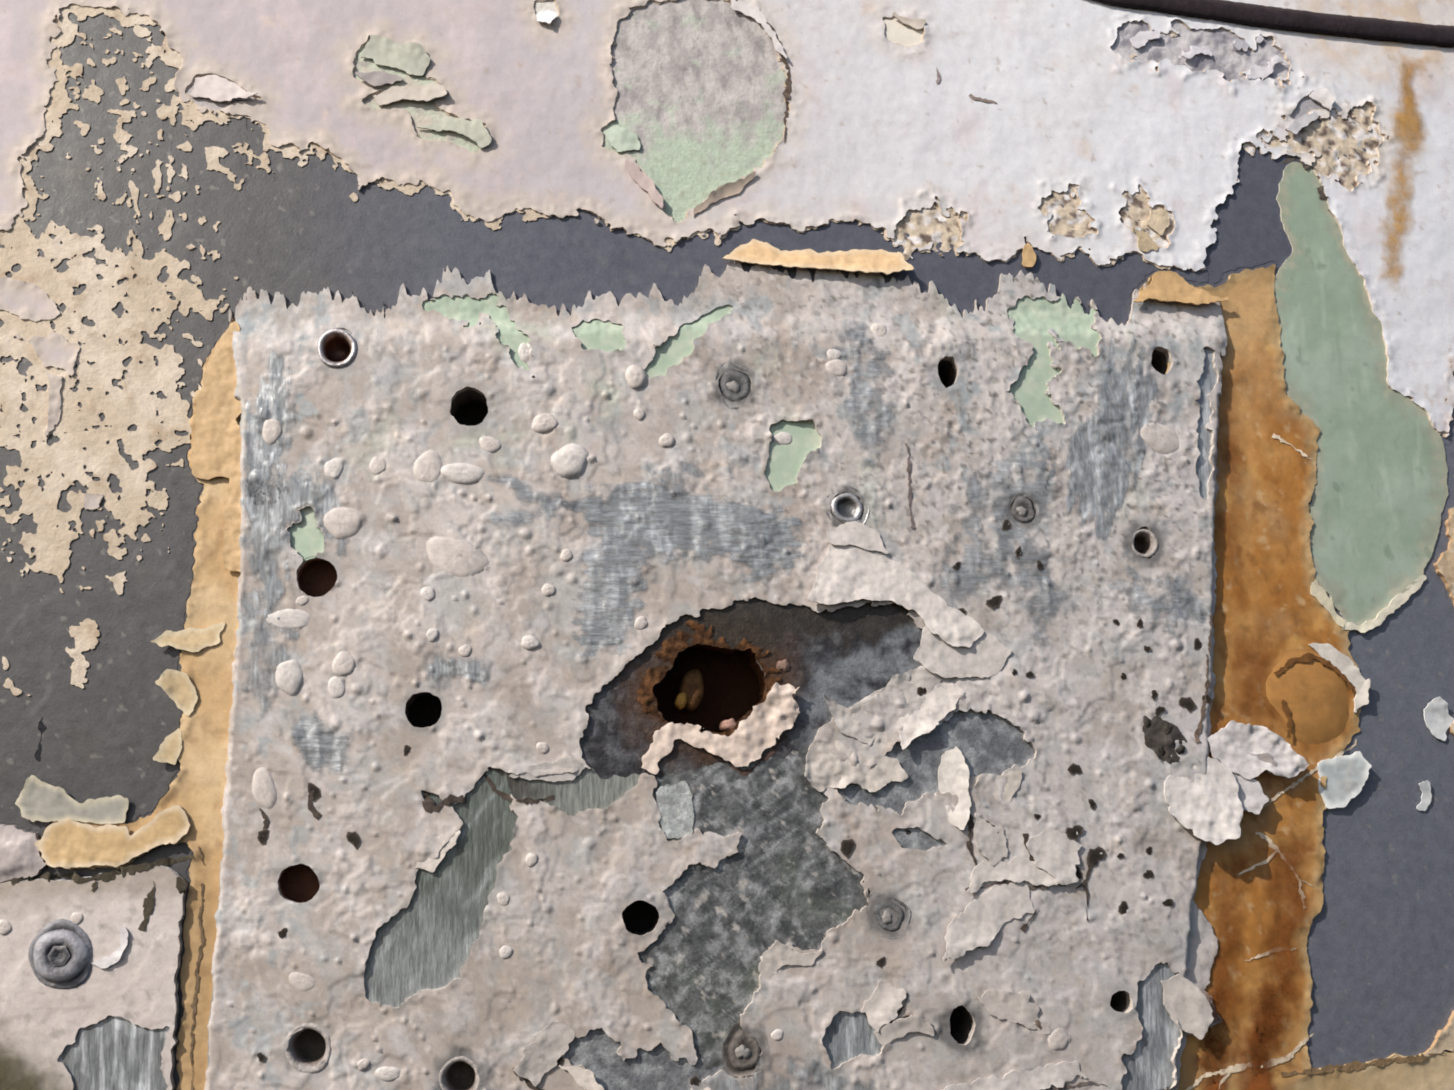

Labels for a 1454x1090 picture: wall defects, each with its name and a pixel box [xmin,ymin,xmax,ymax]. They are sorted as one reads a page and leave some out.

peeling [1110,20,1290,86]
rust [1387,68,1421,276]
peeling [0,0,1229,879]
peeling [1210,88,1454,1069]
peeling [364,338,1159,1090]
peeling [1164,720,1309,845]
peeling [91,926,129,968]
peeling [58,1015,170,1090]
peeling [1121,962,1214,1090]
rust [1200,843,1305,1090]